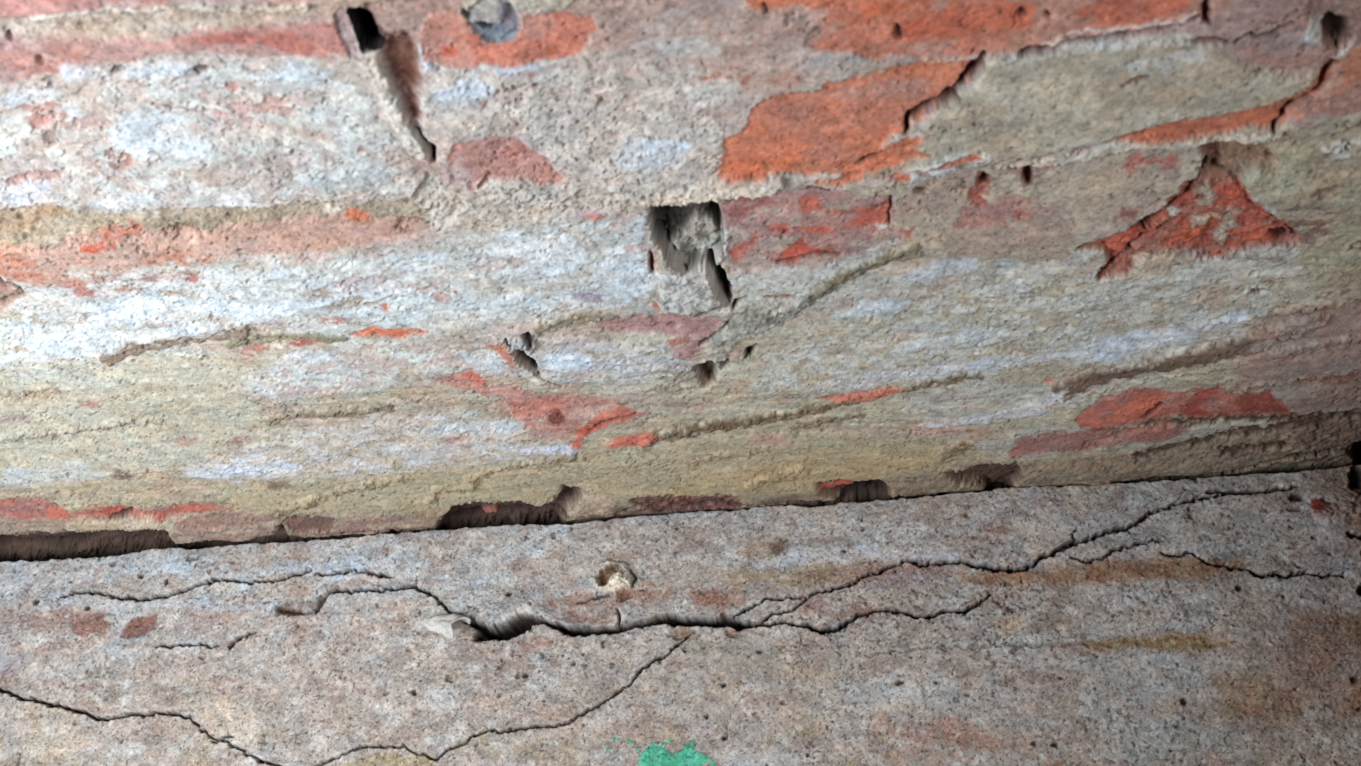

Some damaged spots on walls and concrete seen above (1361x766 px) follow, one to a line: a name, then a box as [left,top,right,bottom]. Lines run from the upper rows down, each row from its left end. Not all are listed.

peeling [0,0,1361,487]
crack [0,447,1351,766]
crack [1346,529,1361,540]